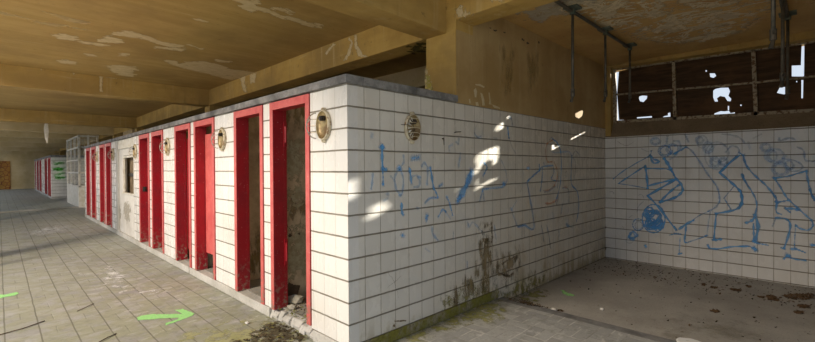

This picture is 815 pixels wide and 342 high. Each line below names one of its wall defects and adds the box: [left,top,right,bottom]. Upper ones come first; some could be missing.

peeling [233,0,324,28]
peeling [548,0,770,43]
peeling [51,30,204,77]
peeling [164,59,254,80]
water stain [454,231,520,306]